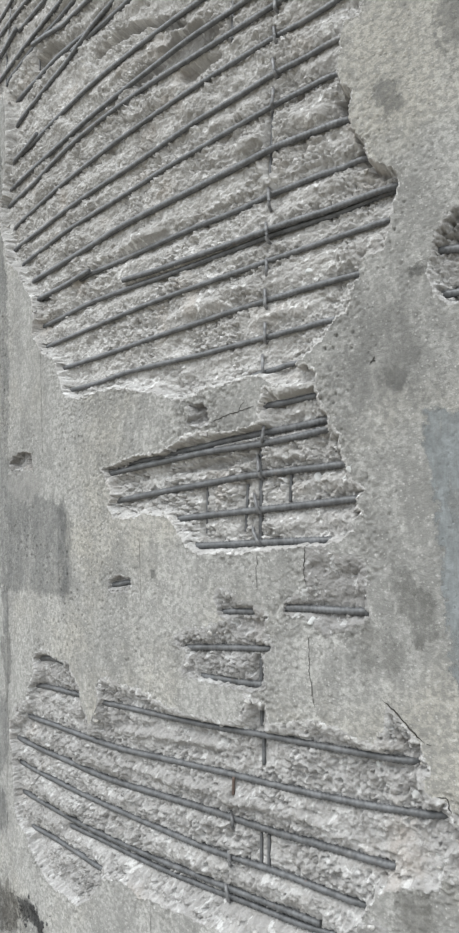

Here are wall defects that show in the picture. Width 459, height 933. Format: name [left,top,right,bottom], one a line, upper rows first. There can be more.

spalling [0,0,400,639]
spalling [425,204,459,305]
spalling [9,588,459,933]